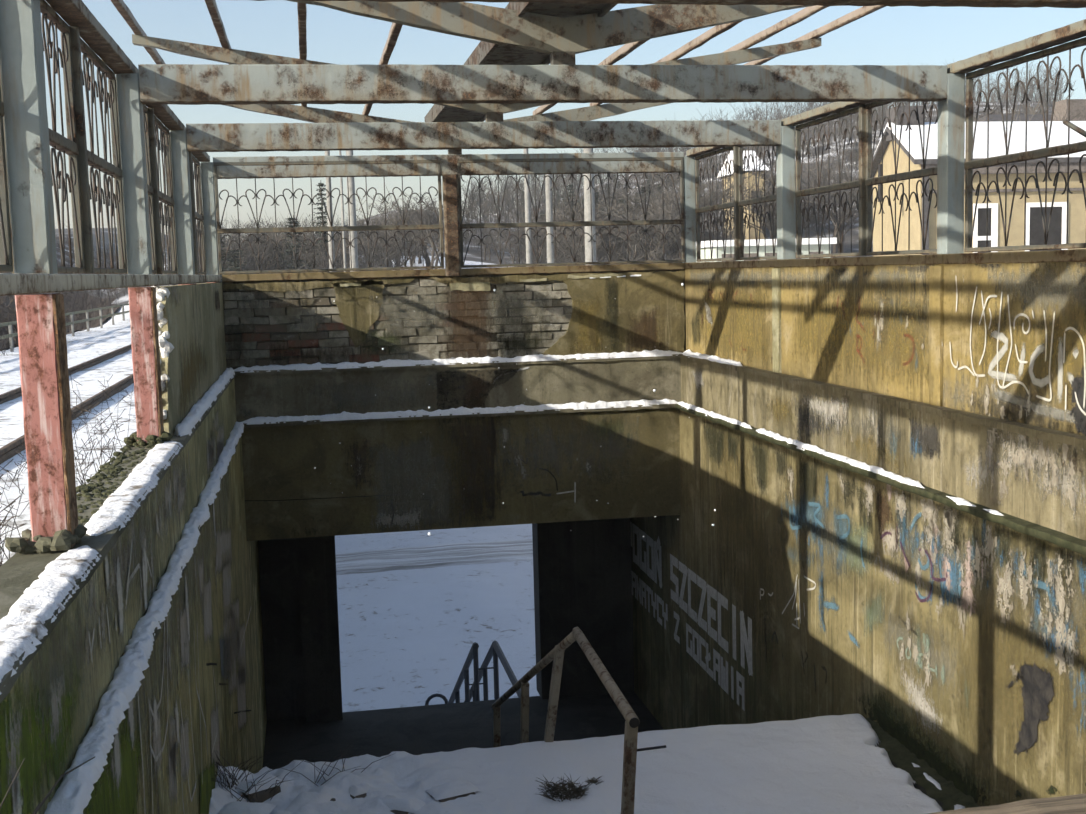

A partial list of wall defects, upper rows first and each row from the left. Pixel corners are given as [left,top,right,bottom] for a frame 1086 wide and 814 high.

rust [507,65,579,99]
spalling [222,273,623,410]
flaking render [970,375,1079,510]
flaking render [1065,367,1086,451]
peeling [863,479,1079,732]